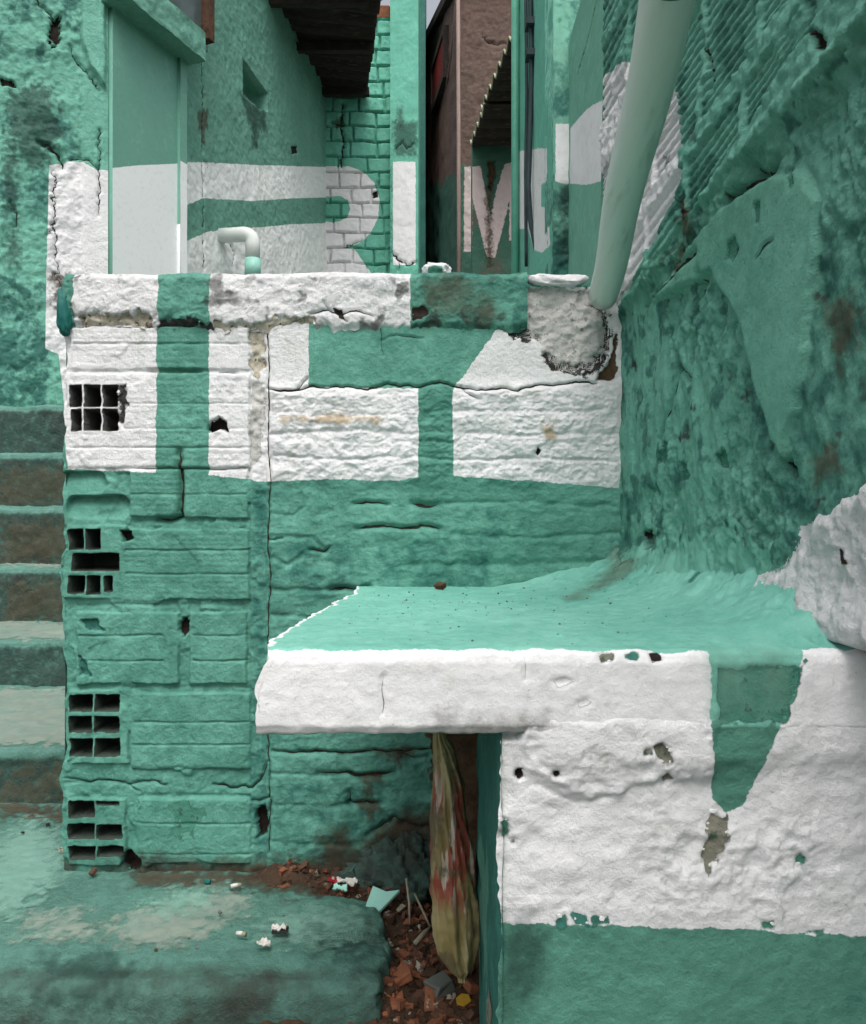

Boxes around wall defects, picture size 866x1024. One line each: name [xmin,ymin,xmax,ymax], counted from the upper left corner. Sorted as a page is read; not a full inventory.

crack [330,104,345,168]
crack [39,131,101,287]
crack [313,303,416,351]
spalling [517,286,618,381]
spalling [79,307,316,467]
crack [162,452,185,521]
crack [267,333,592,652]
water stain [307,812,430,875]